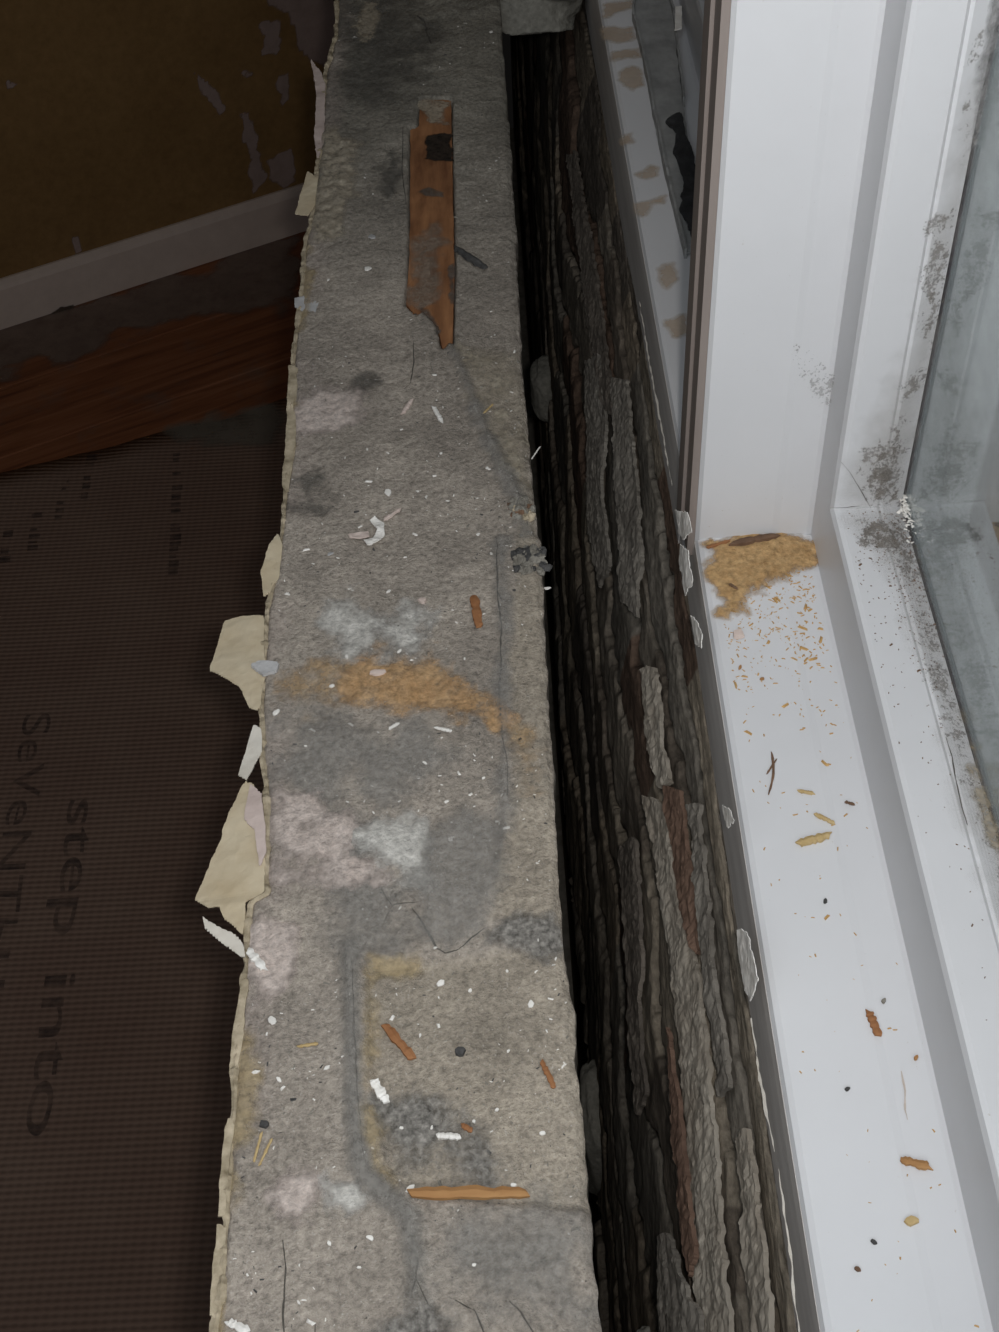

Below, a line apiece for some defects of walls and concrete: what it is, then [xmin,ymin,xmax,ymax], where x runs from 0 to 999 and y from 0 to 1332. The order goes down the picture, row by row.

spalling [267,0,363,241]
spalling [352,2,380,42]
damp [962,0,999,144]
damp [920,209,954,344]
peeling [261,534,283,596]
damp [857,417,999,848]
peeling [195,615,280,957]